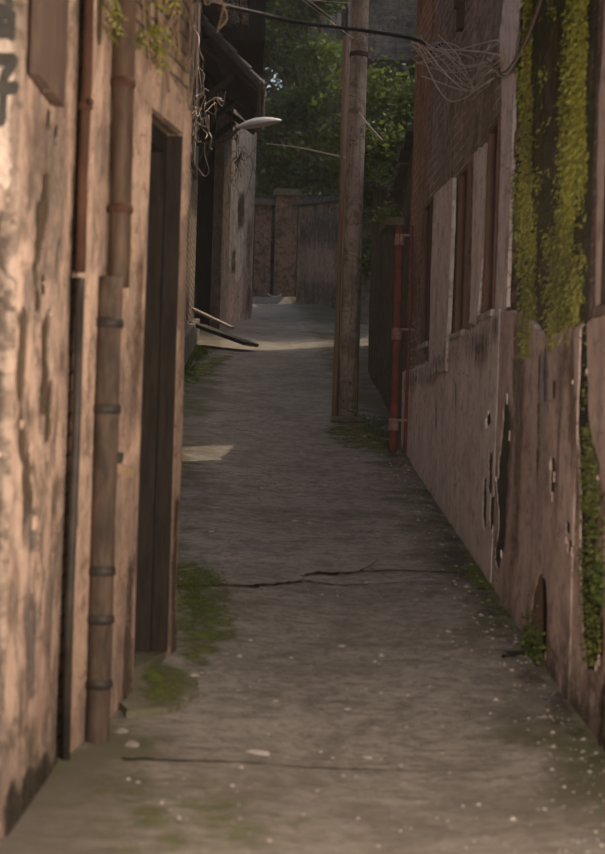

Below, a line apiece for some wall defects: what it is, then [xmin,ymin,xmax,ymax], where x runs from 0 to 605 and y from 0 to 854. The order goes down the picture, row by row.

flaking render [483,393,510,570]
crack [350,559,457,585]